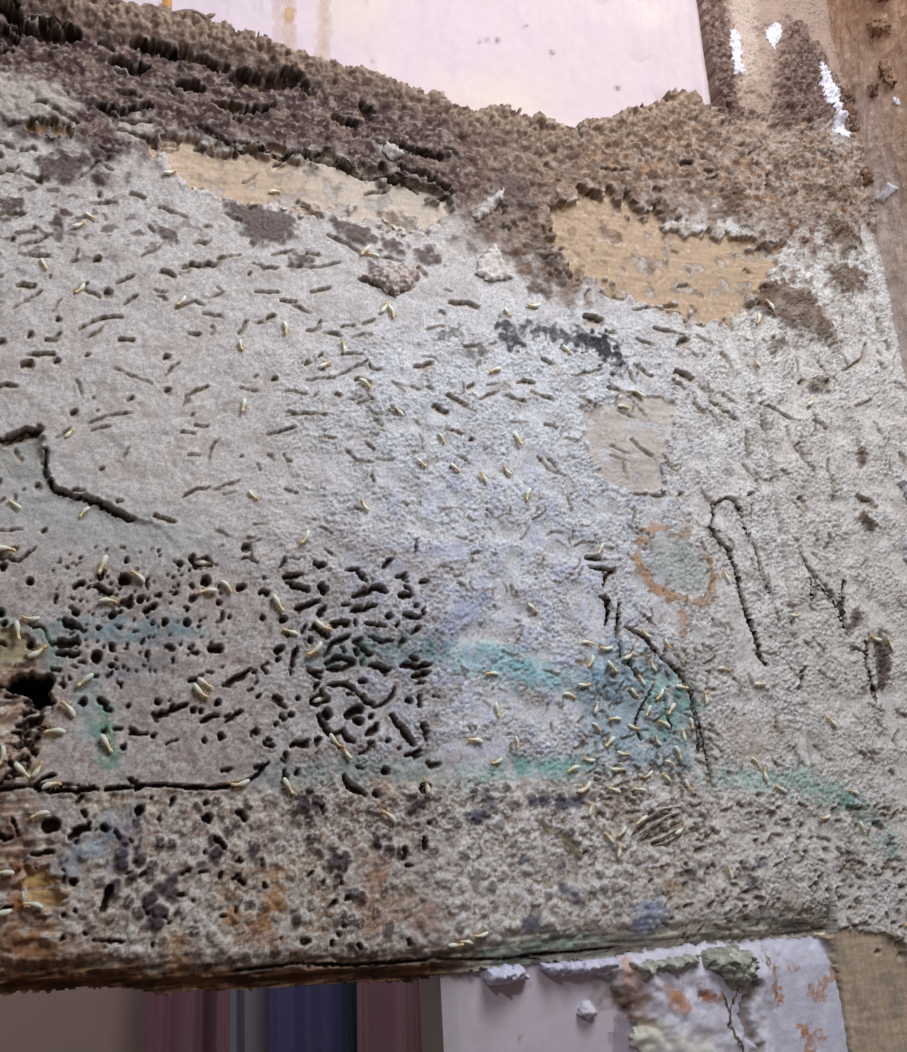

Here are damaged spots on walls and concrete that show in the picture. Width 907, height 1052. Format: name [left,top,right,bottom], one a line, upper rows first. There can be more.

peeling [146,129,450,238]
peeling [546,187,784,327]
crack [0,428,133,522]
crack [708,499,770,666]
crack [2,763,267,794]
crack [238,946,622,971]
peeling [820,928,907,1052]